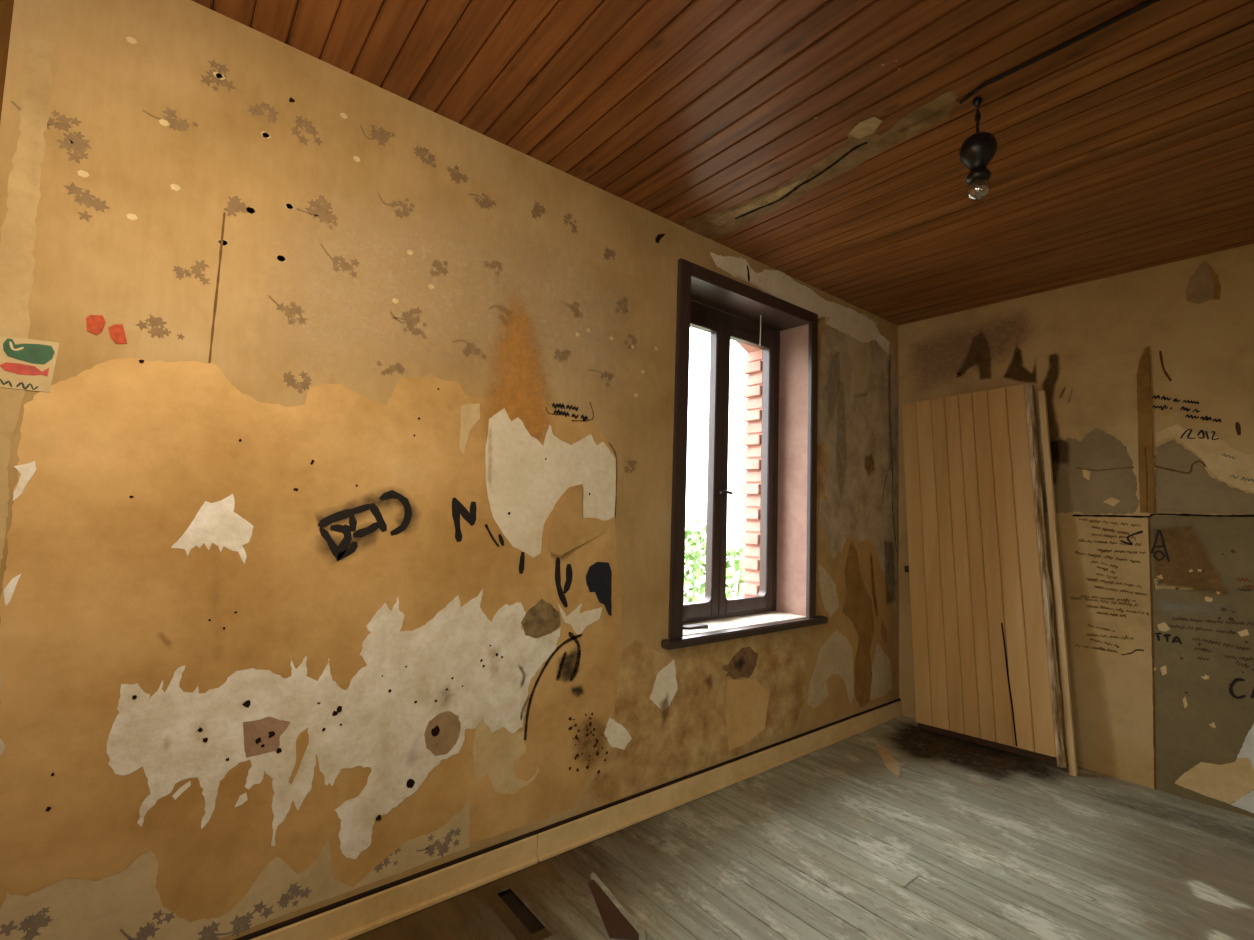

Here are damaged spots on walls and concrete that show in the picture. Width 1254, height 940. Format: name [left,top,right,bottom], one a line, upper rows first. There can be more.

peeling [682,90,957,354]
peeling [0,312,807,922]
water stain [804,313,898,728]
peeling [1042,428,1139,515]
peeling [1149,422,1254,817]